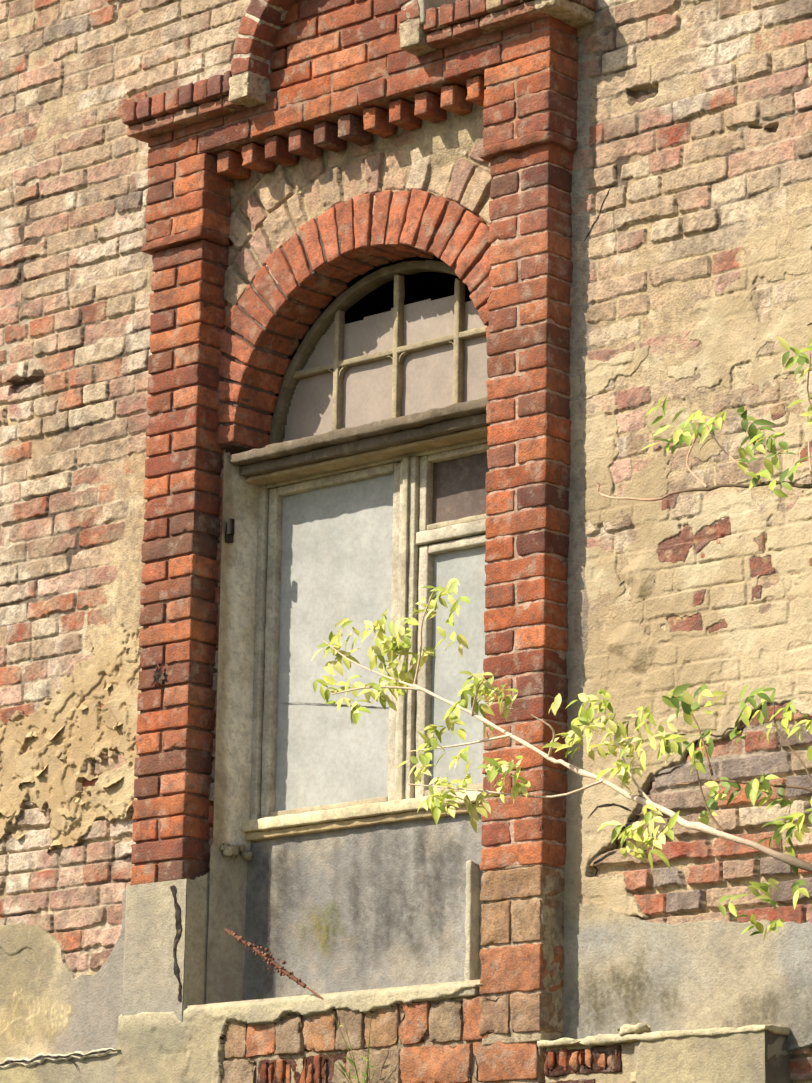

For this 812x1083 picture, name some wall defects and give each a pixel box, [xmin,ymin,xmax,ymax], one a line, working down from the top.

peeling [564,210,812,920]
peeling [0,623,166,851]
crack [170,885,181,1002]
crack [0,1048,120,1070]